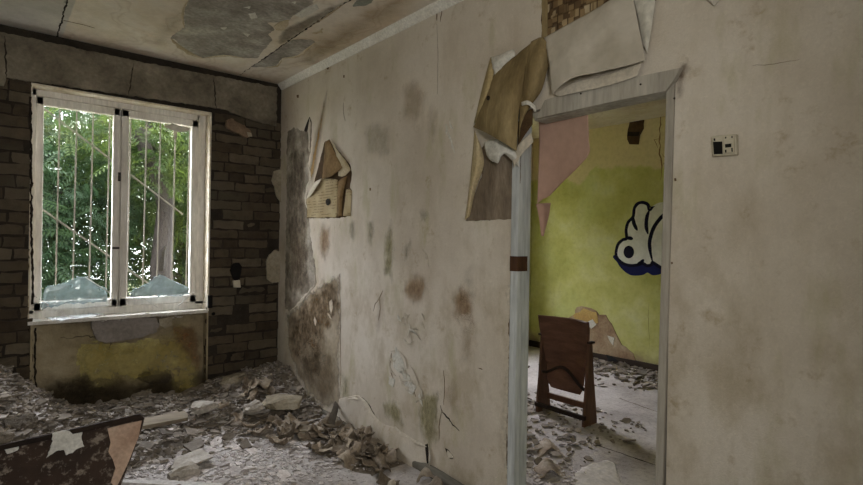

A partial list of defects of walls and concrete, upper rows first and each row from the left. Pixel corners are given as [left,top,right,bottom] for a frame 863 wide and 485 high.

crack [56,0,94,37]
peeling [171,0,323,68]
flaking render [285,117,340,405]
leakage [50,328,198,405]
flaking render [569,306,658,391]